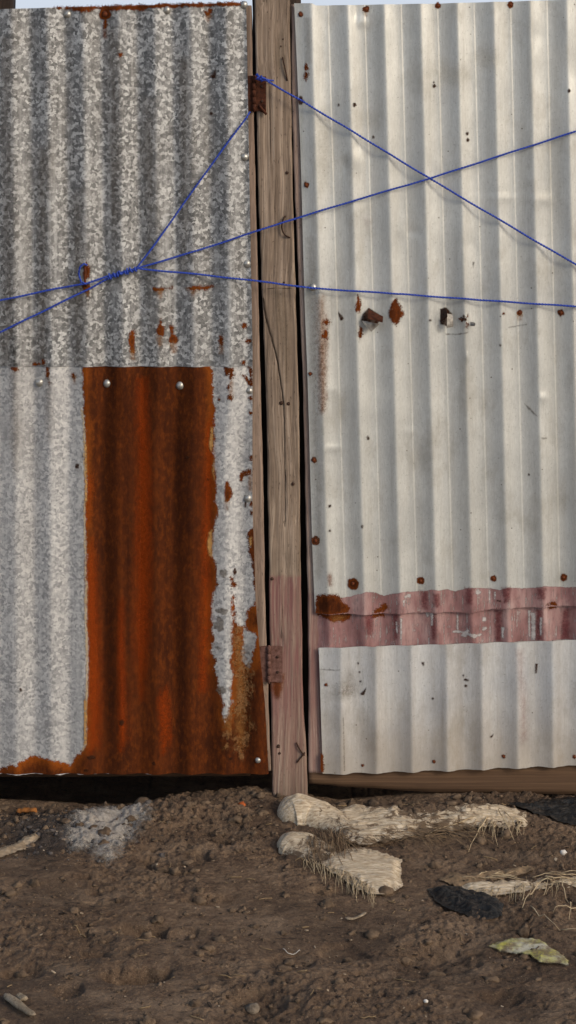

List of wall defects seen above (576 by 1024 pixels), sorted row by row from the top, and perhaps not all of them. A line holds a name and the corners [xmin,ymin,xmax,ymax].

corrosion [53,0,241,37]
corrosion [152,285,214,295]
corrosion [155,318,179,352]
corrosion [354,295,363,339]
corrosion [388,298,405,327]
corrosion [0,329,284,775]
corrosion [315,578,359,623]
corrosion [372,603,389,618]